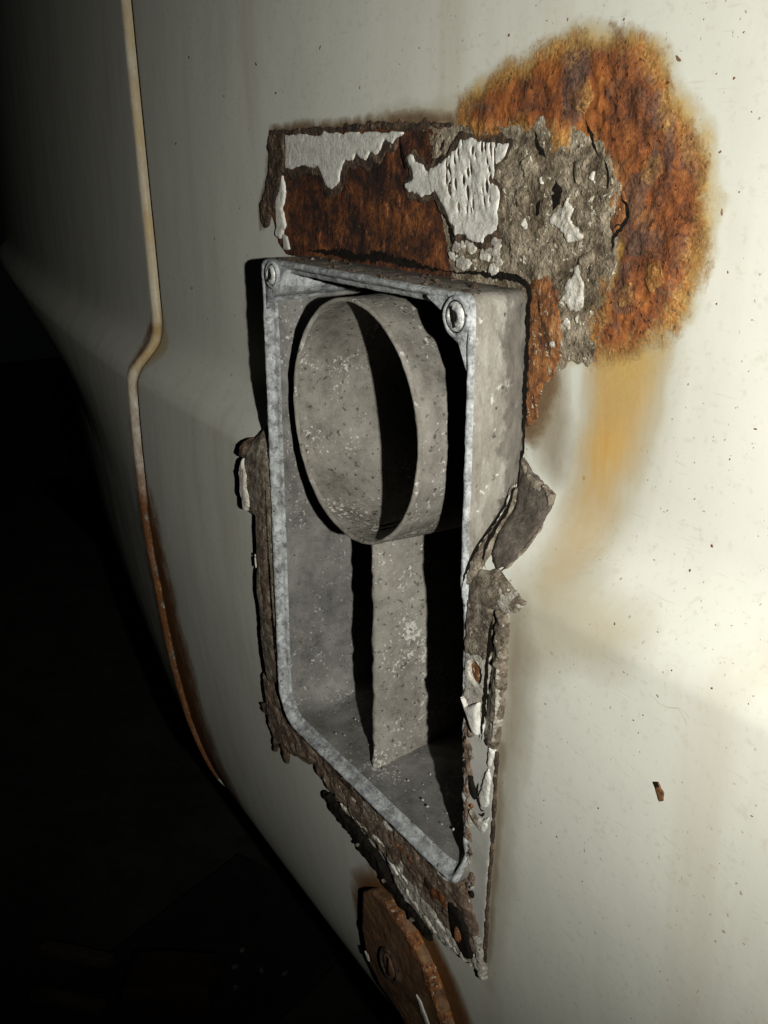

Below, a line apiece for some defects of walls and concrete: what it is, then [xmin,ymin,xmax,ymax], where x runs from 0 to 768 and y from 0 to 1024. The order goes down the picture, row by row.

peeling [275,131,544,276]
peeling [549,198,584,242]
peeling [559,250,595,330]
peeling [573,157,595,183]
rust [456,18,723,527]
crack [586,121,629,255]
rust [354,873,470,1024]